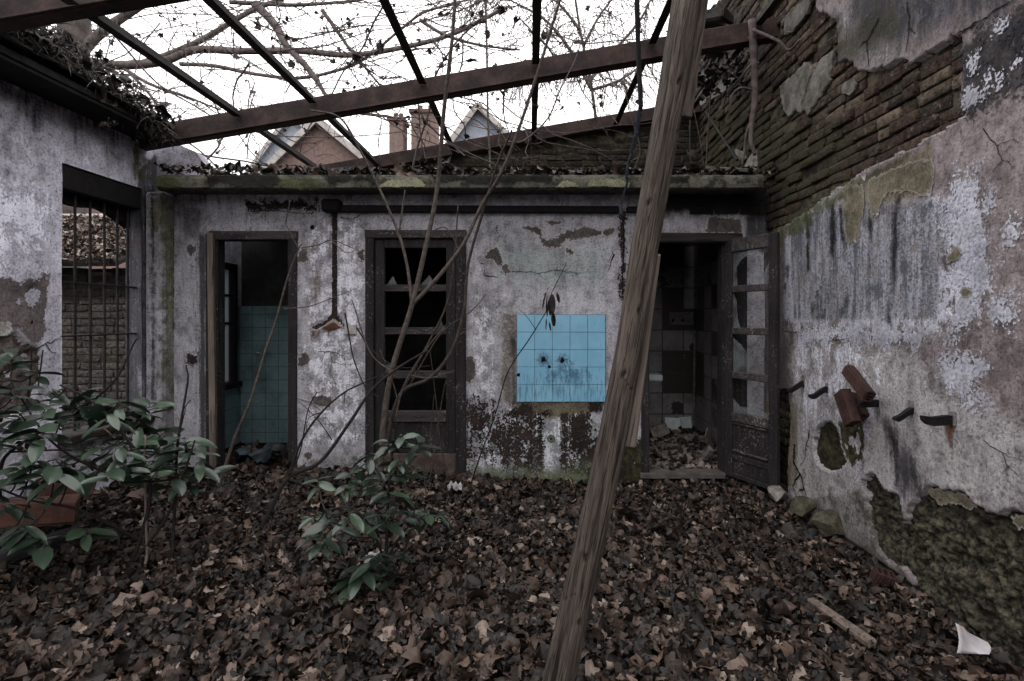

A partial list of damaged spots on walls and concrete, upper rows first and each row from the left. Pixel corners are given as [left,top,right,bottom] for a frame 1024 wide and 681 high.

peeling [482,247,512,276]
peeling [521,219,616,256]
leakage [829,203,845,257]
flaking render [690,0,1024,427]
leakage [887,195,900,326]
crack [983,128,1022,171]
peeling [0,271,51,416]
flaking render [866,475,1024,670]